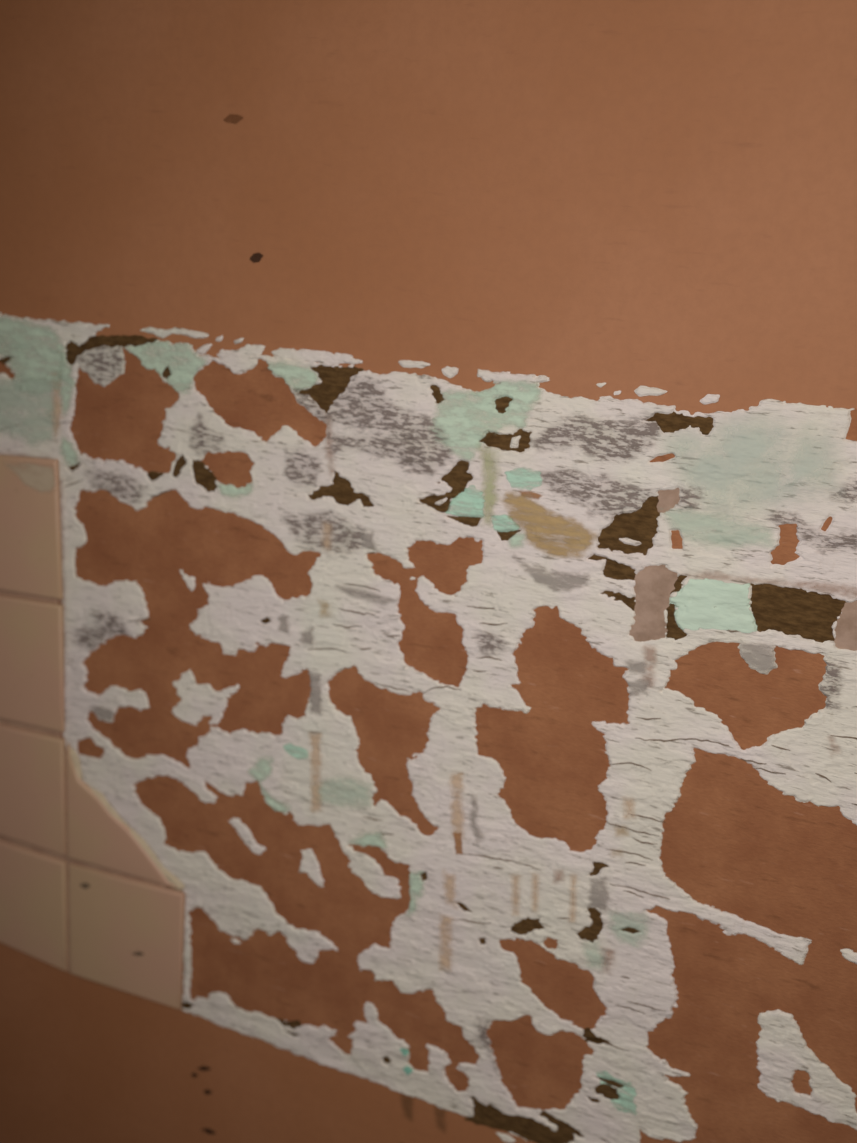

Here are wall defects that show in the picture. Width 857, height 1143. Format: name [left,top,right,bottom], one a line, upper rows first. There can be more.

peeling [0,356,15,379]
peeling [596,383,668,397]
spalling [645,394,720,435]
peeling [846,409,857,441]
peeling [650,453,675,462]
spalling [588,496,683,611]
peeling [771,523,800,565]
peeling [65,327,630,1143]
peeling [639,575,857,1143]